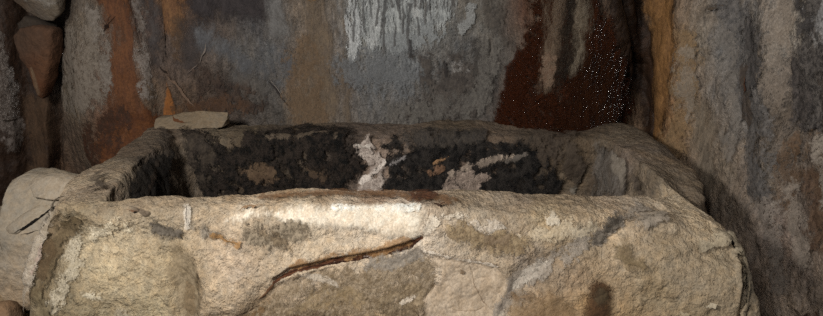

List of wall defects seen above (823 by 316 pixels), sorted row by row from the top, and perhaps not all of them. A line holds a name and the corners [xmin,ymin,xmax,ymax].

damp [332,0,641,197]
damp [632,25,655,137]
crack [14,205,56,235]
crack [242,208,430,315]
damp [227,203,598,256]